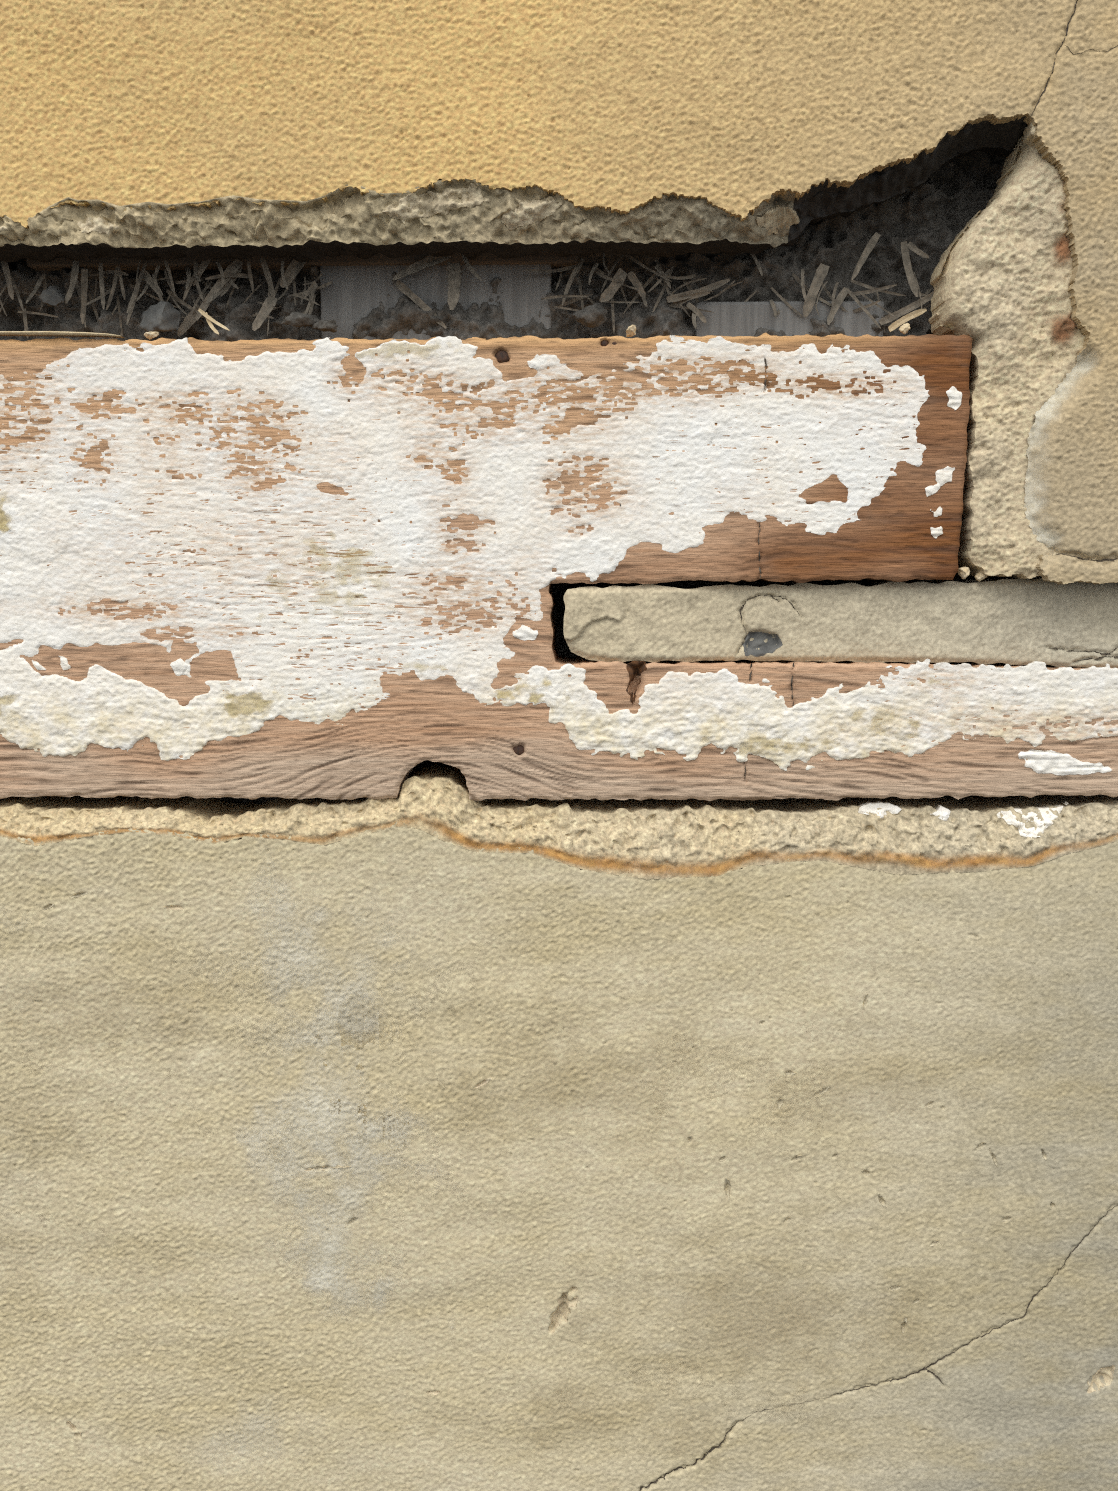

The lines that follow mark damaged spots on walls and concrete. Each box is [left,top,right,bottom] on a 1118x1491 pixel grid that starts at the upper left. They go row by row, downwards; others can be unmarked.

crack [1029,0,1118,119]
peeling [0,116,1118,775]
spalling [0,765,1118,879]
crack [640,1206,1115,1491]